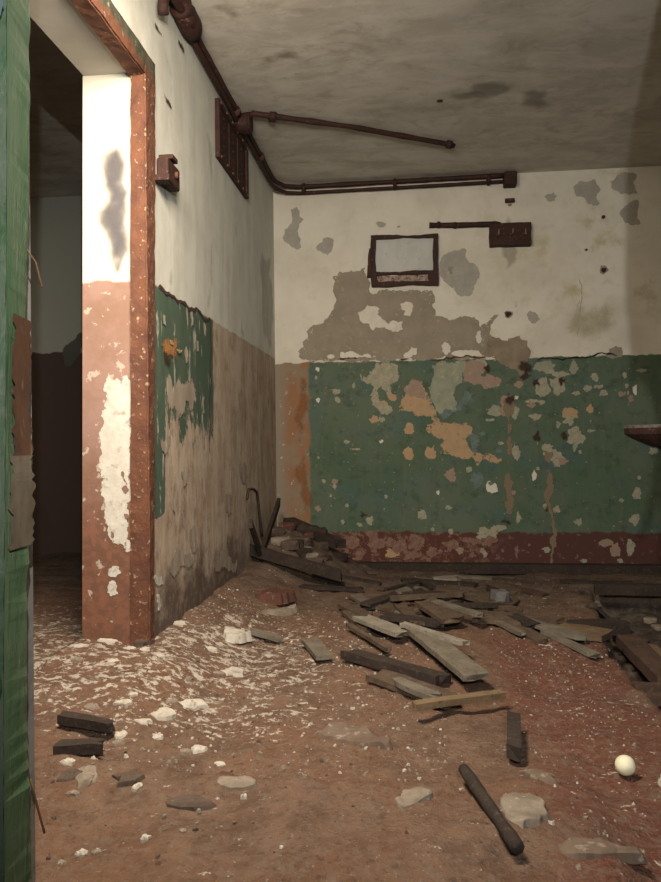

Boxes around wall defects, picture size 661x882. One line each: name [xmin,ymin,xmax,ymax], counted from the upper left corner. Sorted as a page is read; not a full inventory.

spalling [573,179,606,219]
spalling [610,172,641,225]
spalling [439,248,480,296]
peeling [184,312,206,363]
spalling [298,268,647,493]
peeling [8,313,36,551]
peeling [159,374,204,454]
peeling [98,373,131,552]
peeling [619,476,642,502]
peeling [336,510,531,560]
peeling [599,539,636,563]
peeling [107,566,121,596]